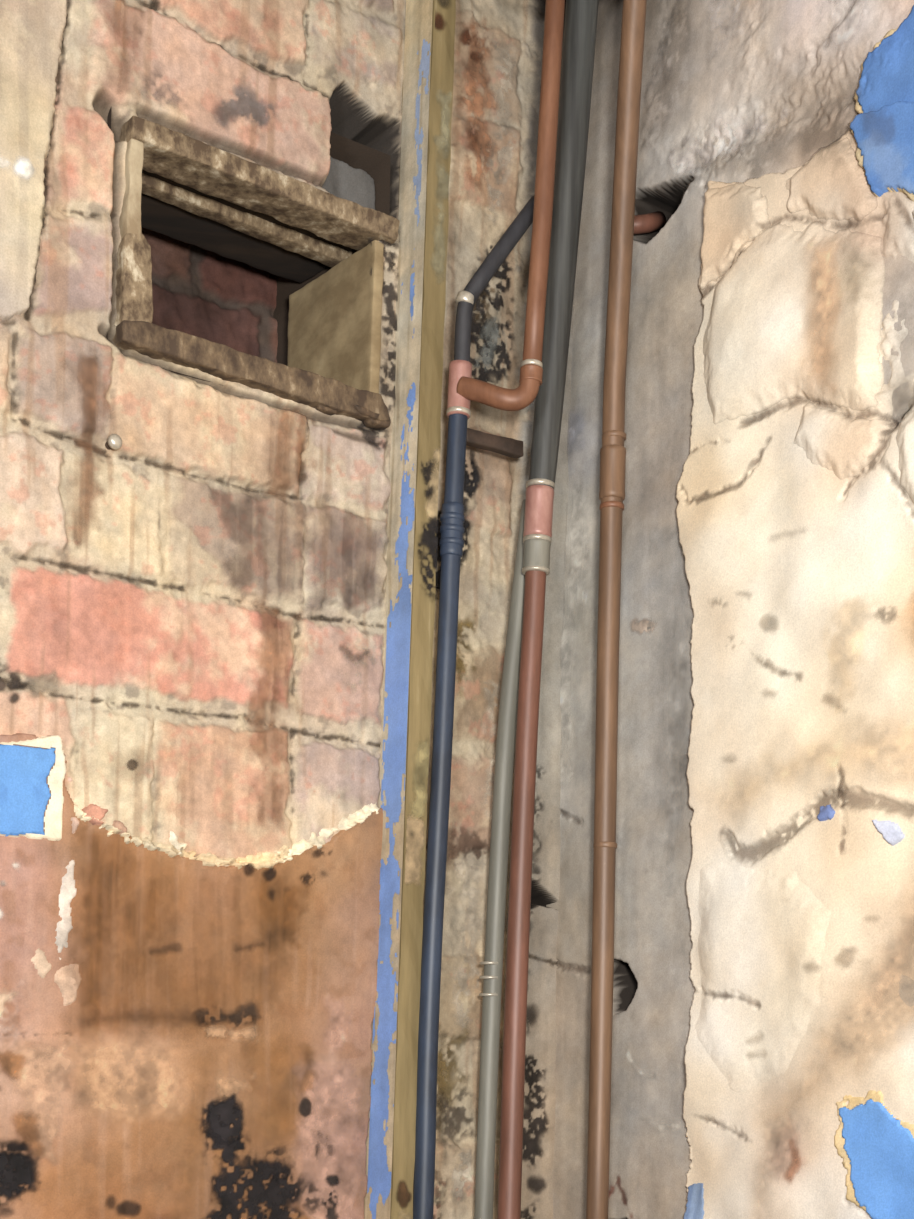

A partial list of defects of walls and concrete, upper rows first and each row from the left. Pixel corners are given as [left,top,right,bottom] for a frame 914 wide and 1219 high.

crack [140,0,166,15]
peeling [849,5,914,201]
crack [3,0,69,351]
leakage [470,259,514,382]
crack [13,403,305,498]
crack [697,399,827,501]
peeling [0,735,131,841]
peeling [31,860,82,1006]
leakage [0,1115,42,1206]
leakage [202,1081,339,1219]
leakage [522,1055,548,1192]
peeling [834,1090,914,1219]